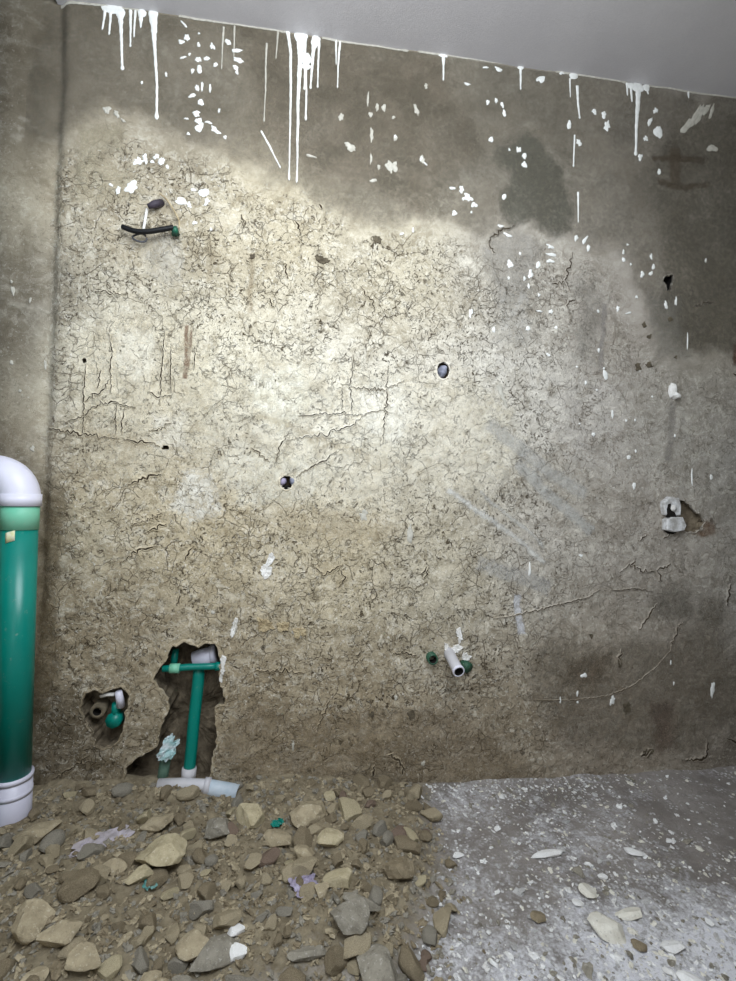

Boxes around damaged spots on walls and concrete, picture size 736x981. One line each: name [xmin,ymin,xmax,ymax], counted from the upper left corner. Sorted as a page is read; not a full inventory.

damp [35,1,736,344]
crack [488,225,515,255]
crack [552,252,576,308]
crack [49,330,197,447]
crack [251,354,405,476]
crack [127,472,161,486]
crack [122,512,167,563]
spalling [677,498,706,535]
crack [313,564,348,588]
crack [493,533,675,630]
spalling [78,684,131,751]
spalling [122,639,228,779]